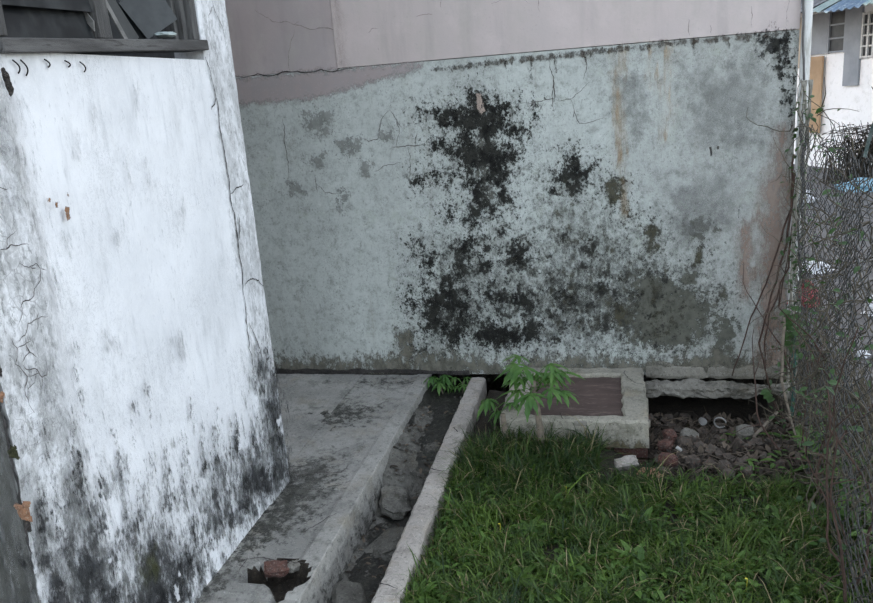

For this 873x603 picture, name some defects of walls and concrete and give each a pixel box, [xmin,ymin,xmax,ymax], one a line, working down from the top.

crack [237,68,356,78]
water stain [431,56,514,74]
water stain [520,35,730,73]
water stain [735,23,796,126]
crack [205,57,264,366]
crack [0,218,48,413]
water stain [0,64,777,603]
spalling [646,361,784,380]
crack [0,407,39,603]